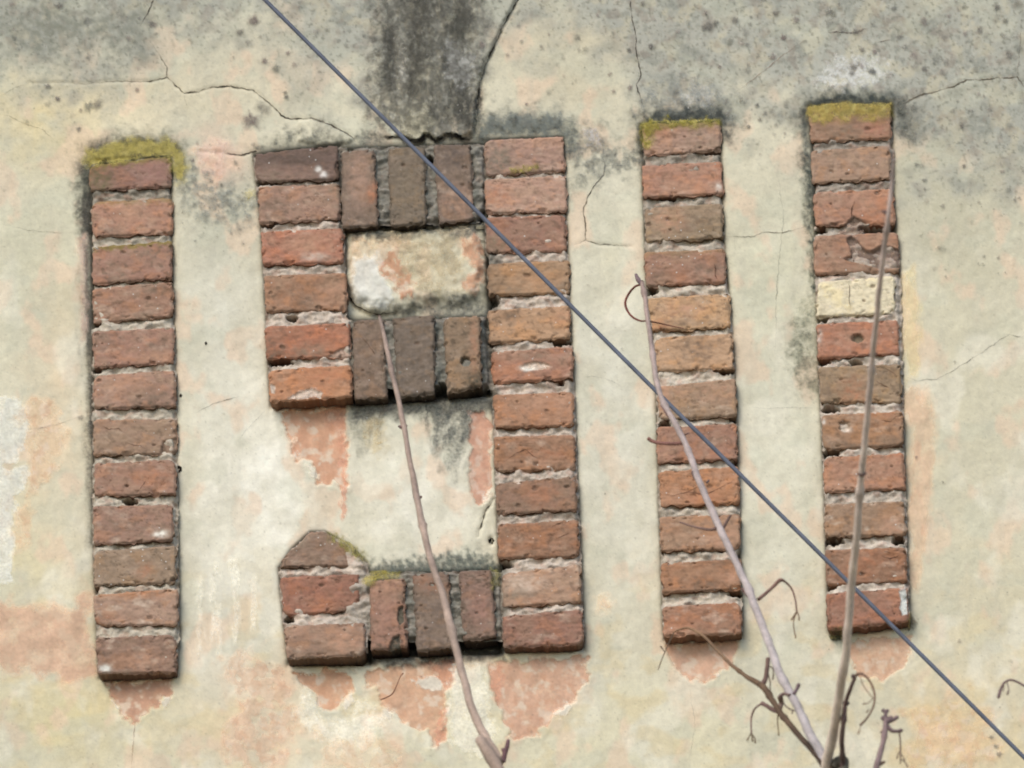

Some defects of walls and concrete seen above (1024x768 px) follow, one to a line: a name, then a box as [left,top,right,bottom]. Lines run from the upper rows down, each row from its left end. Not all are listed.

crack [101,47,353,138]
damp [364,0,498,146]
crack [474,0,519,132]
crack [630,0,641,99]
crack [905,34,1023,103]
crack [580,177,623,246]
peeling [276,389,349,519]
peeling [0,592,173,725]
peeling [364,661,456,747]
peeling [488,654,590,740]
peeling [666,641,738,683]
peeling [850,635,912,681]